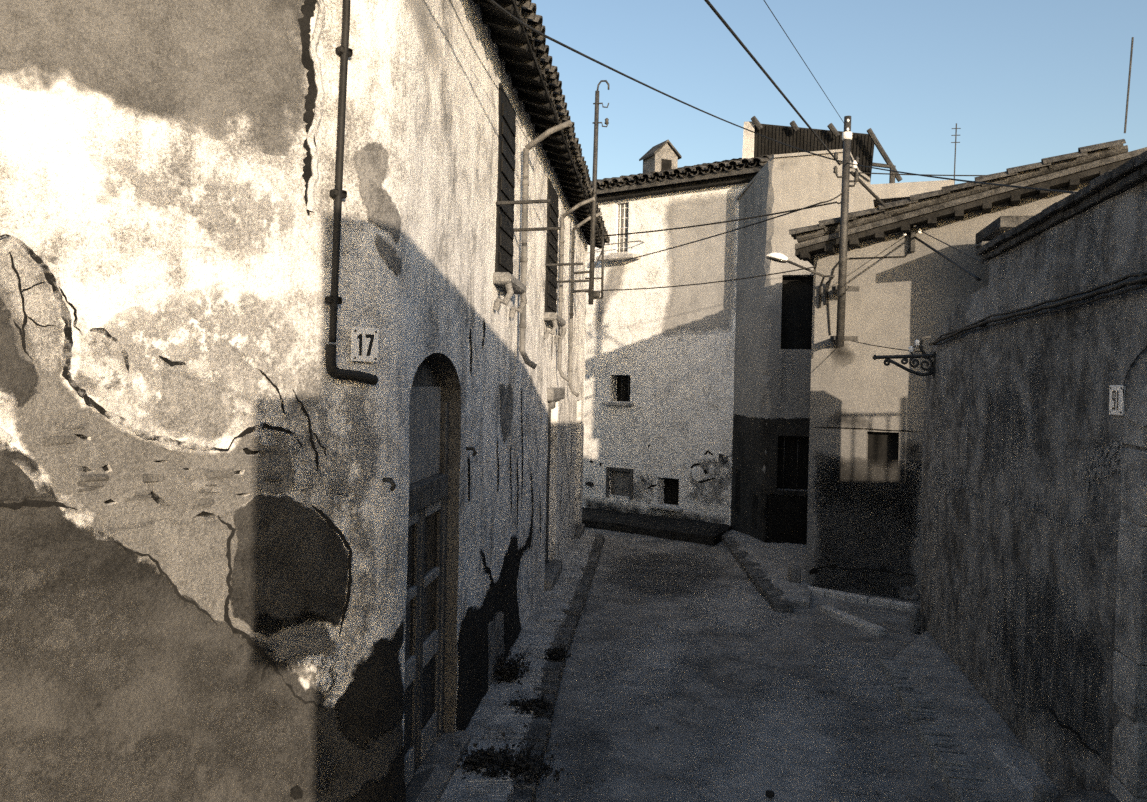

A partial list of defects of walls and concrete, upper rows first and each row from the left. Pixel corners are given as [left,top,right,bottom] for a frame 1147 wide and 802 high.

crack [298,0,326,215]
flaking render [104,163,292,250]
flaking render [353,142,402,276]
crack [0,234,327,472]
crack [0,499,78,511]
flaking render [0,236,405,802]
crack [311,505,352,637]
flaking render [488,612,504,690]